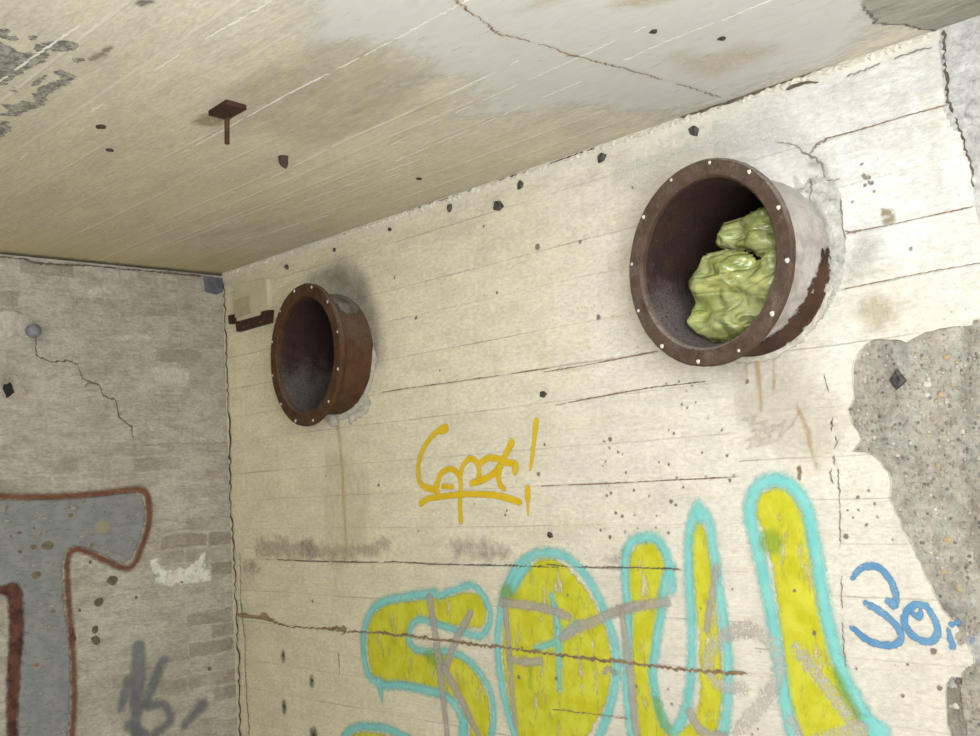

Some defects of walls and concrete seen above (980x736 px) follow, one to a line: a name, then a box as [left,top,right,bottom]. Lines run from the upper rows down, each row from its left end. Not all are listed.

peeling [0,28,85,137]
crack [456,0,821,118]
crack [778,30,974,240]
spalling [860,0,980,216]
rust [743,247,831,375]
crack [0,256,747,736]
spalling [848,319,980,736]